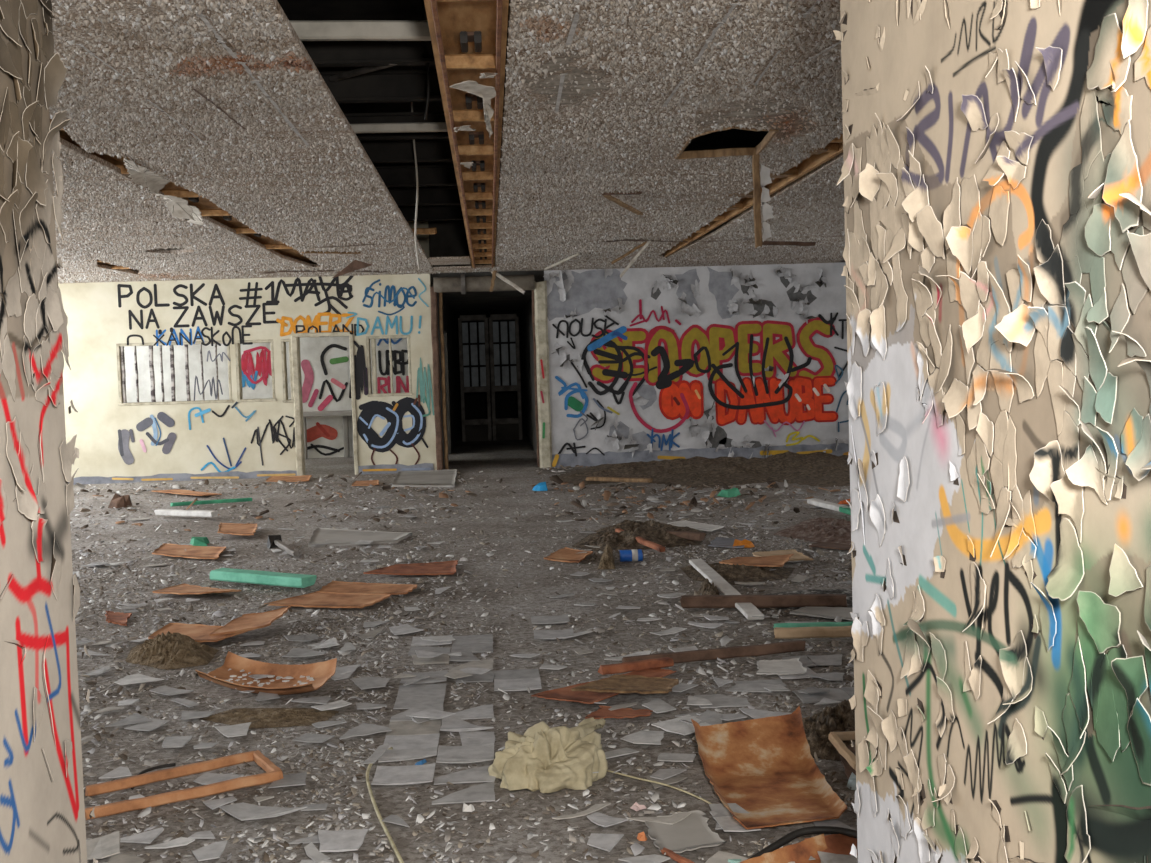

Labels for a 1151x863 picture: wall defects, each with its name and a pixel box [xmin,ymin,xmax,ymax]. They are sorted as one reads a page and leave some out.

spalling [678,126,779,159]
peeling [0,0,78,412]
peeling [543,268,627,326]
peeling [651,266,828,324]
peeling [822,0,1151,863]
peeling [0,416,81,621]
peeling [64,740,73,778]